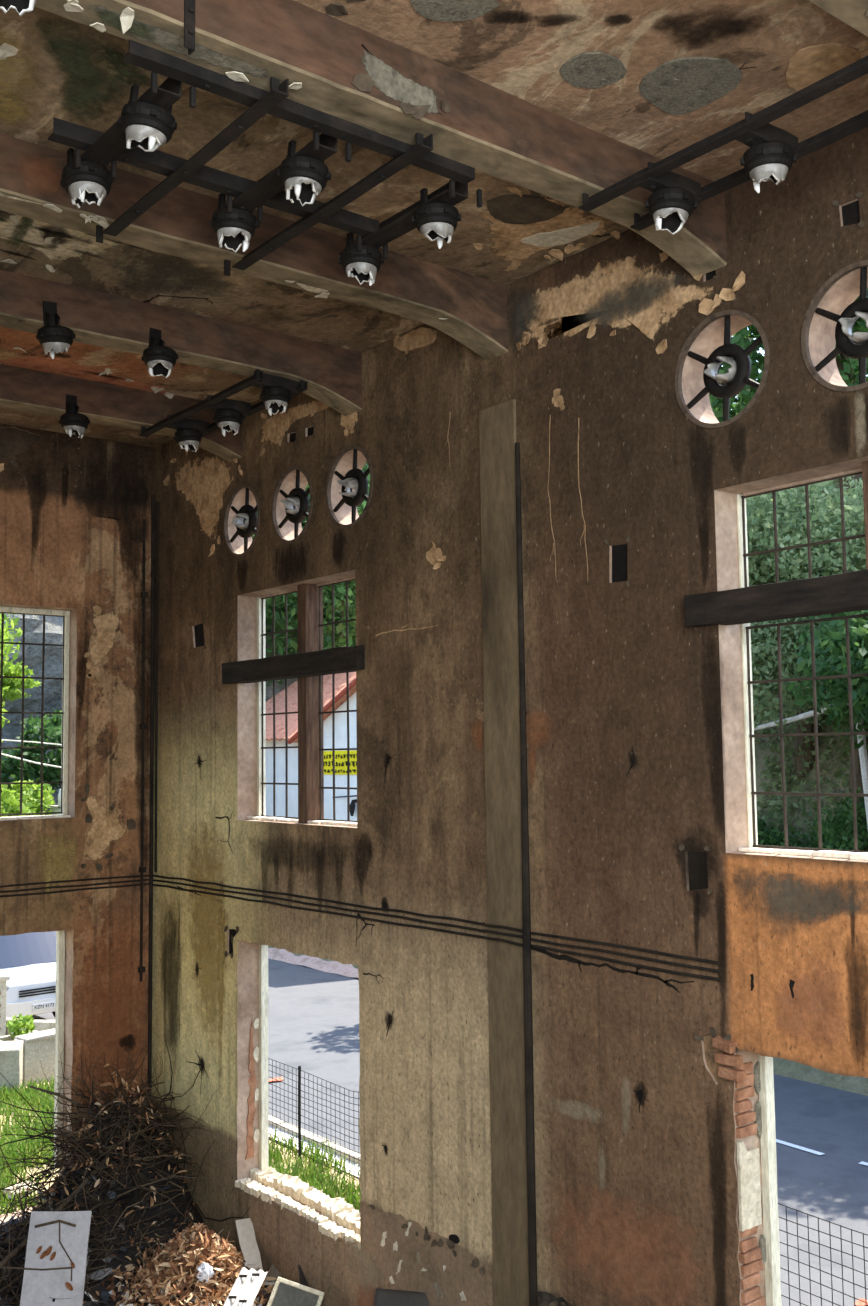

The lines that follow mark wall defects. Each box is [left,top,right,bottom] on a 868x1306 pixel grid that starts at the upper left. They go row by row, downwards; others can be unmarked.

damp [489,12,577,26]
damp [607,15,631,26]
flaking render [351,51,451,120]
spalling [560,52,627,89]
flaking render [473,187,620,272]
flaking render [507,249,745,354]
damp [30,471,45,548]
flaking render [163,450,243,557]
damp [703,645,724,824]
damp [717,874,861,996]
damp [849,959,868,1055]
flaking render [361,1202,486,1306]